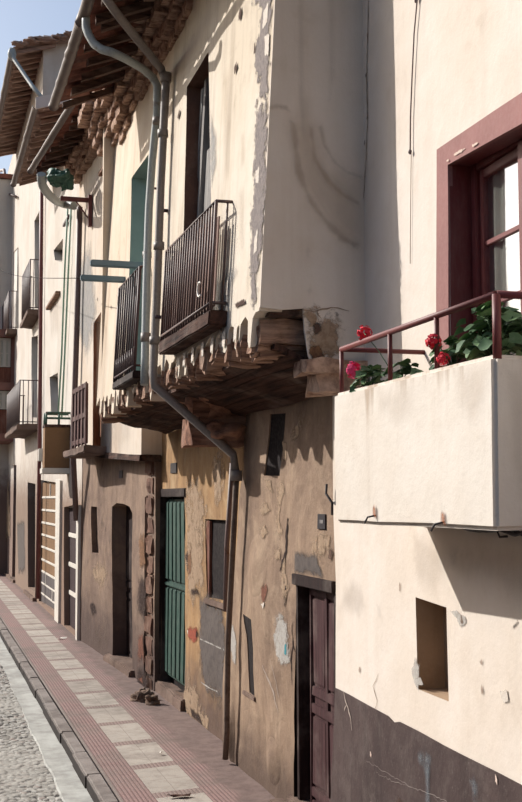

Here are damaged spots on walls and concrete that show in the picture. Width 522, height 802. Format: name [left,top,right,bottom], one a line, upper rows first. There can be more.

peeling [235,0,272,308]
crack [370,763,447,802]